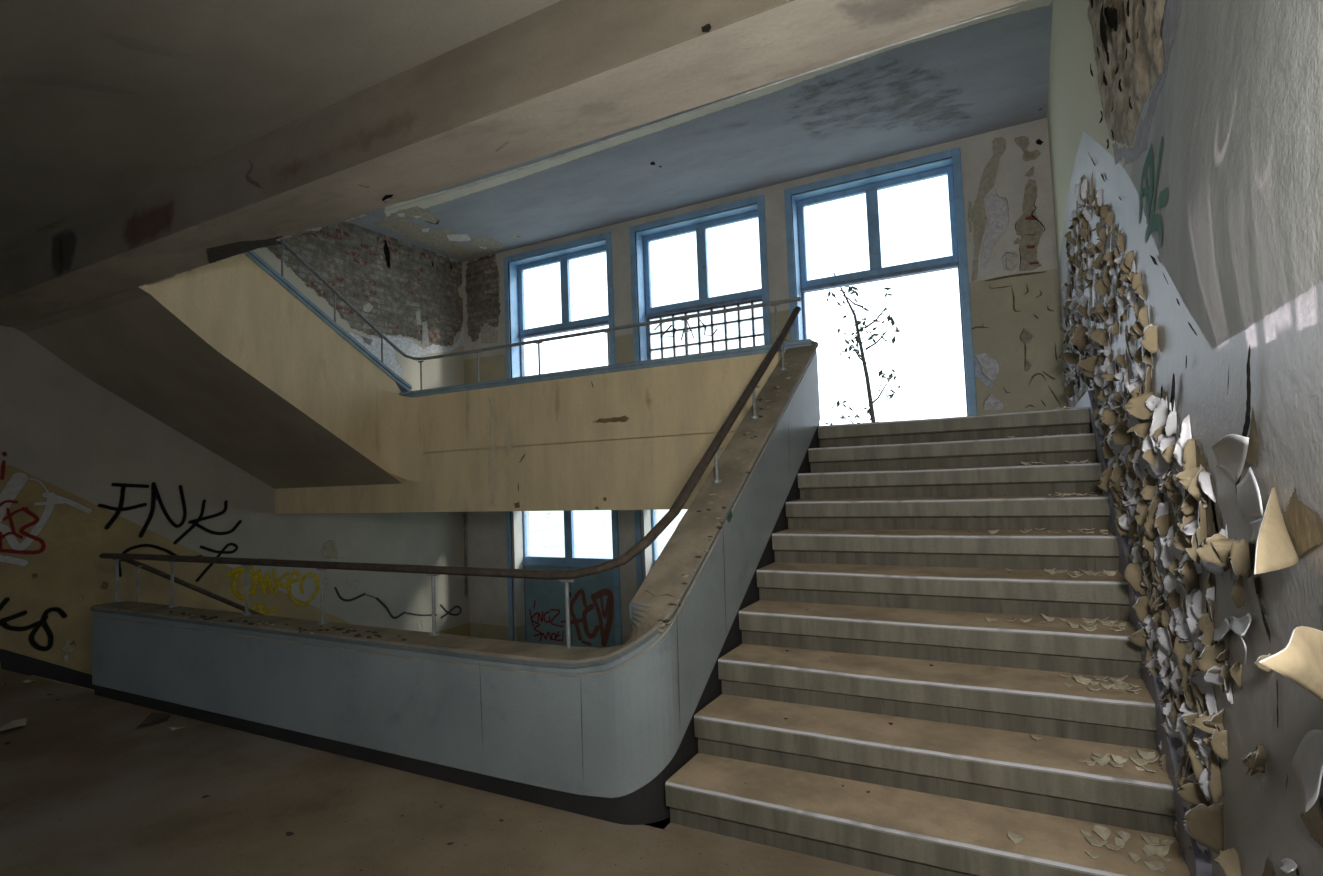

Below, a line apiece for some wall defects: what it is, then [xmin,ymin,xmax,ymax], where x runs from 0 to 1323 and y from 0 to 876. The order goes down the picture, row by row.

spalling [696,0,1022,111]
damp [798,65,967,134]
flaking render [1088,0,1181,166]
flaking render [243,119,670,376]
flaking render [981,136,1045,271]
peeling [974,353,1004,411]
peeling [1059,154,1323,876]